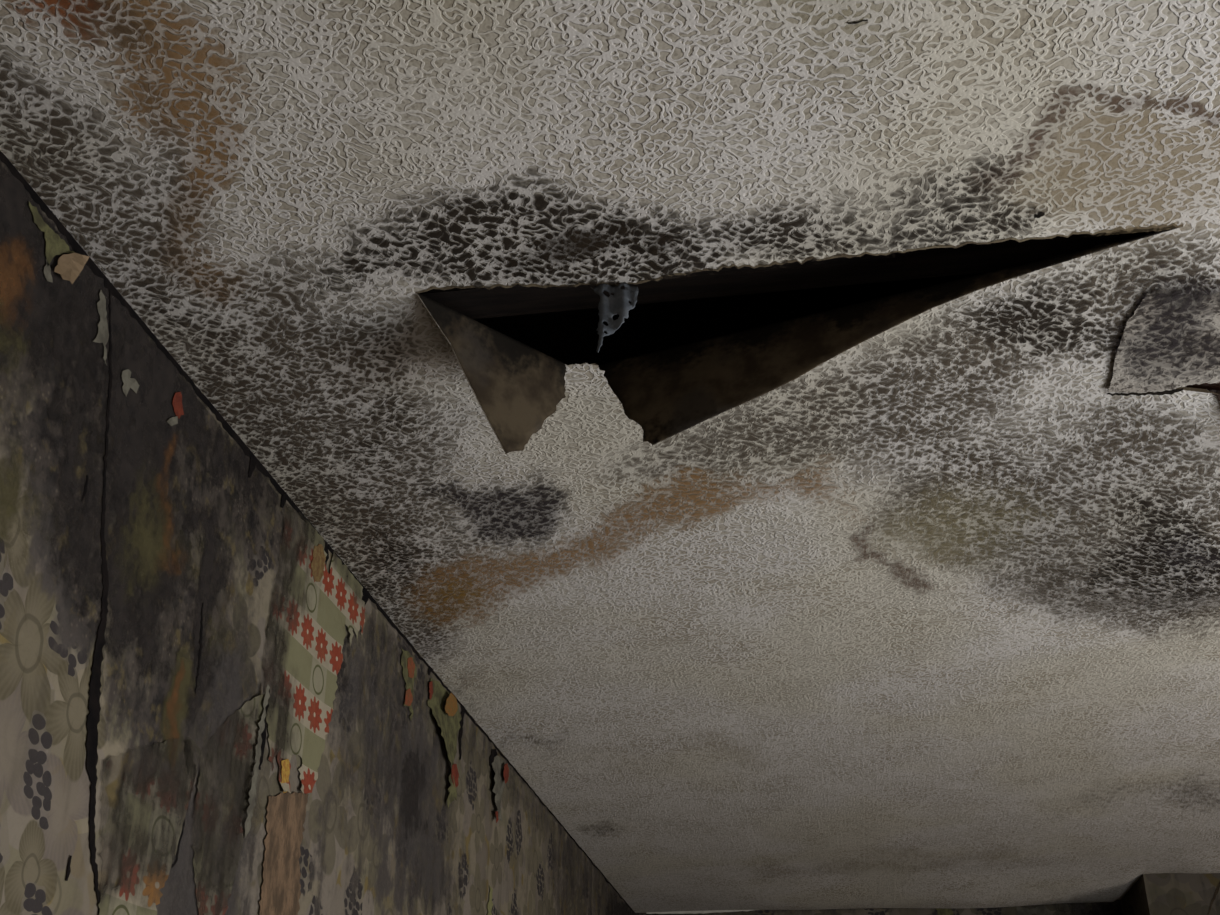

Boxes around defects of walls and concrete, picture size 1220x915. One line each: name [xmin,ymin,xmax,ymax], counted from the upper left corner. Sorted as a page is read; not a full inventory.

water stain [1145,96,1220,126]
peeling [98,508,365,915]
crack [0,151,632,914]
water stain [337,637,451,902]
water stain [0,54,1131,827]
peeling [1108,265,1220,393]